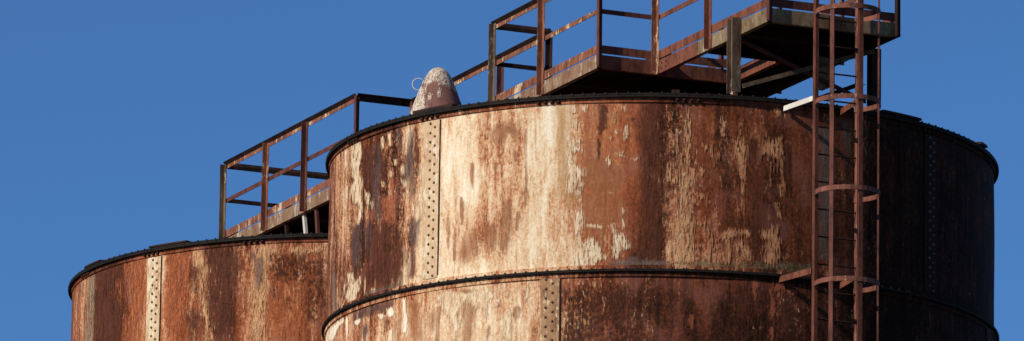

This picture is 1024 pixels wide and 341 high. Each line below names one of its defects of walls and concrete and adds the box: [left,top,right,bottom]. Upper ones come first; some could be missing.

peeling [344,142,375,226]
corrosion [370,178,396,227]
peeling [381,67,458,224]
corrosion [447,125,527,260]
peeling [565,104,631,266]
peeling [666,108,786,268]
corrosion [115,259,147,341]
peeling [343,271,376,302]
peeling [378,245,426,341]
corrosion [395,302,440,341]
corrosion [457,290,473,340]
corrosion [752,281,801,341]